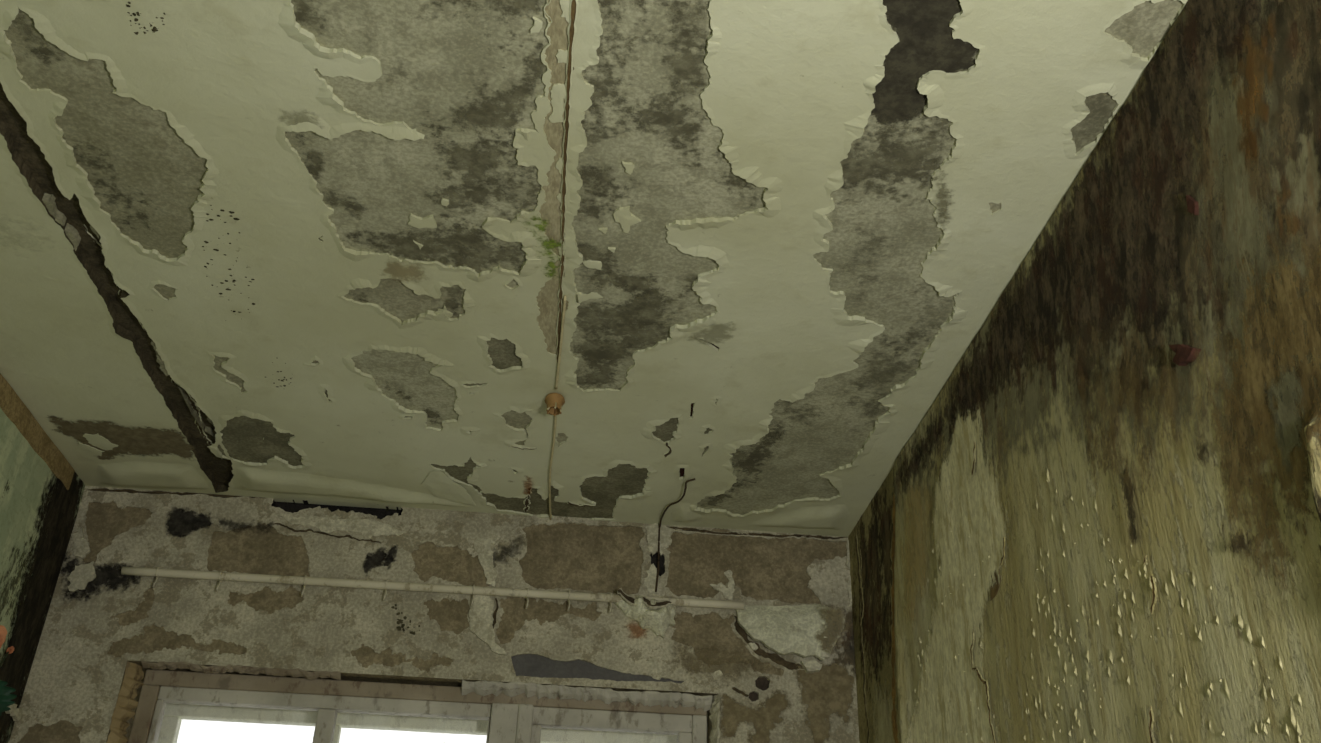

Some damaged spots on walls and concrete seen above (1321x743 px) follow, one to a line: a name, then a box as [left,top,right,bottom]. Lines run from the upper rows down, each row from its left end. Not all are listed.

peeling [0,2,219,266]
peeling [276,0,783,394]
crack [171,378,222,459]
peeling [206,351,312,471]
peeling [342,333,531,432]
peeling [391,0,986,704]
damp [720,0,1321,743]
flaking render [67,498,158,592]
flaking render [204,498,405,616]
flaking render [105,585,249,659]
flaking render [344,641,461,675]
damp [678,645,760,680]